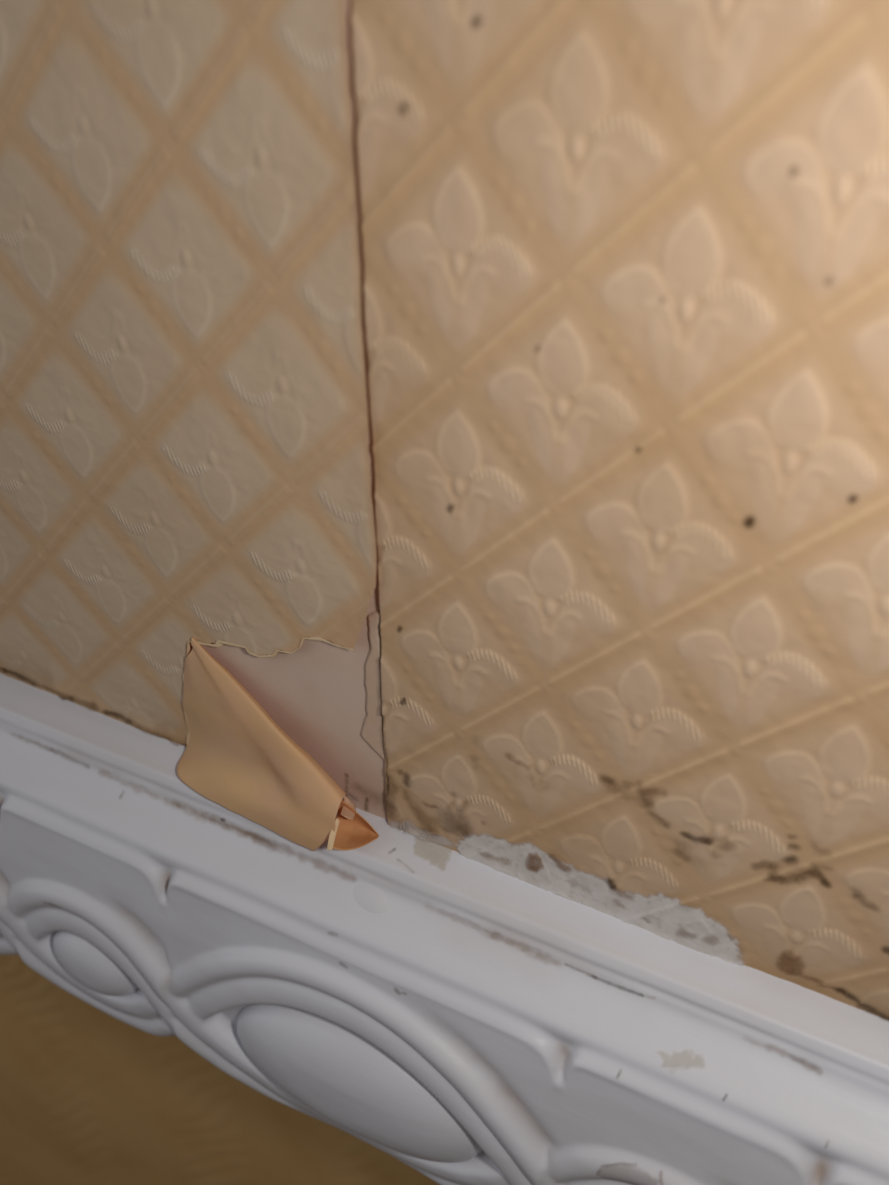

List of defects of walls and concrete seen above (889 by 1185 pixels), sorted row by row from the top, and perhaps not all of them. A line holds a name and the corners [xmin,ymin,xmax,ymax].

leakage [528,855,568,871]
leakage [778,953,802,974]